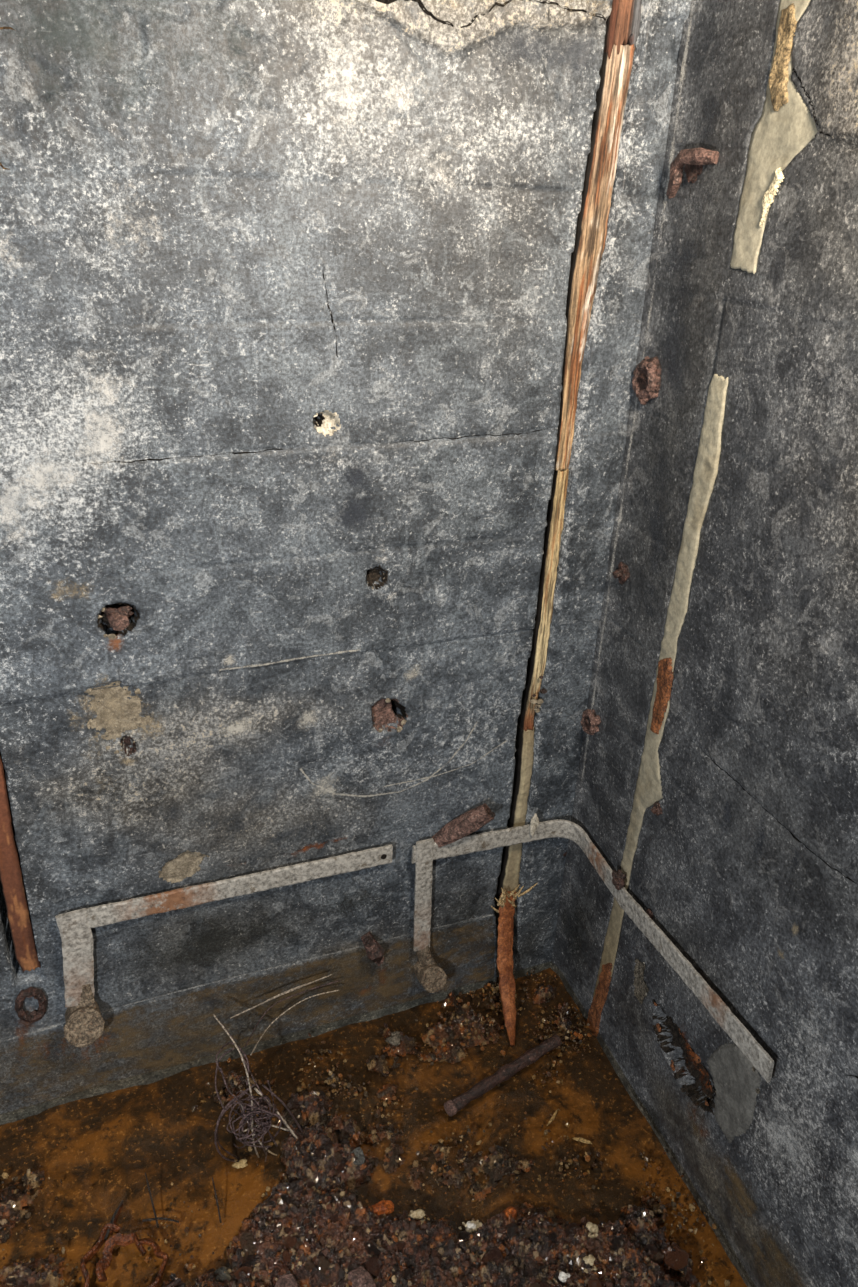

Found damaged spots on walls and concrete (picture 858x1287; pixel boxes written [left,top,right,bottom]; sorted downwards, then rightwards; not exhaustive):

crack [376,0,606,28]
corrosion [684,164,703,183]
corrosion [632,356,662,405]
corrosion [650,658,674,734]
corrosion [0,752,41,972]
corrosion [586,963,612,1037]
corrosion [444,1034,562,1116]
corrosion [652,999,716,1115]